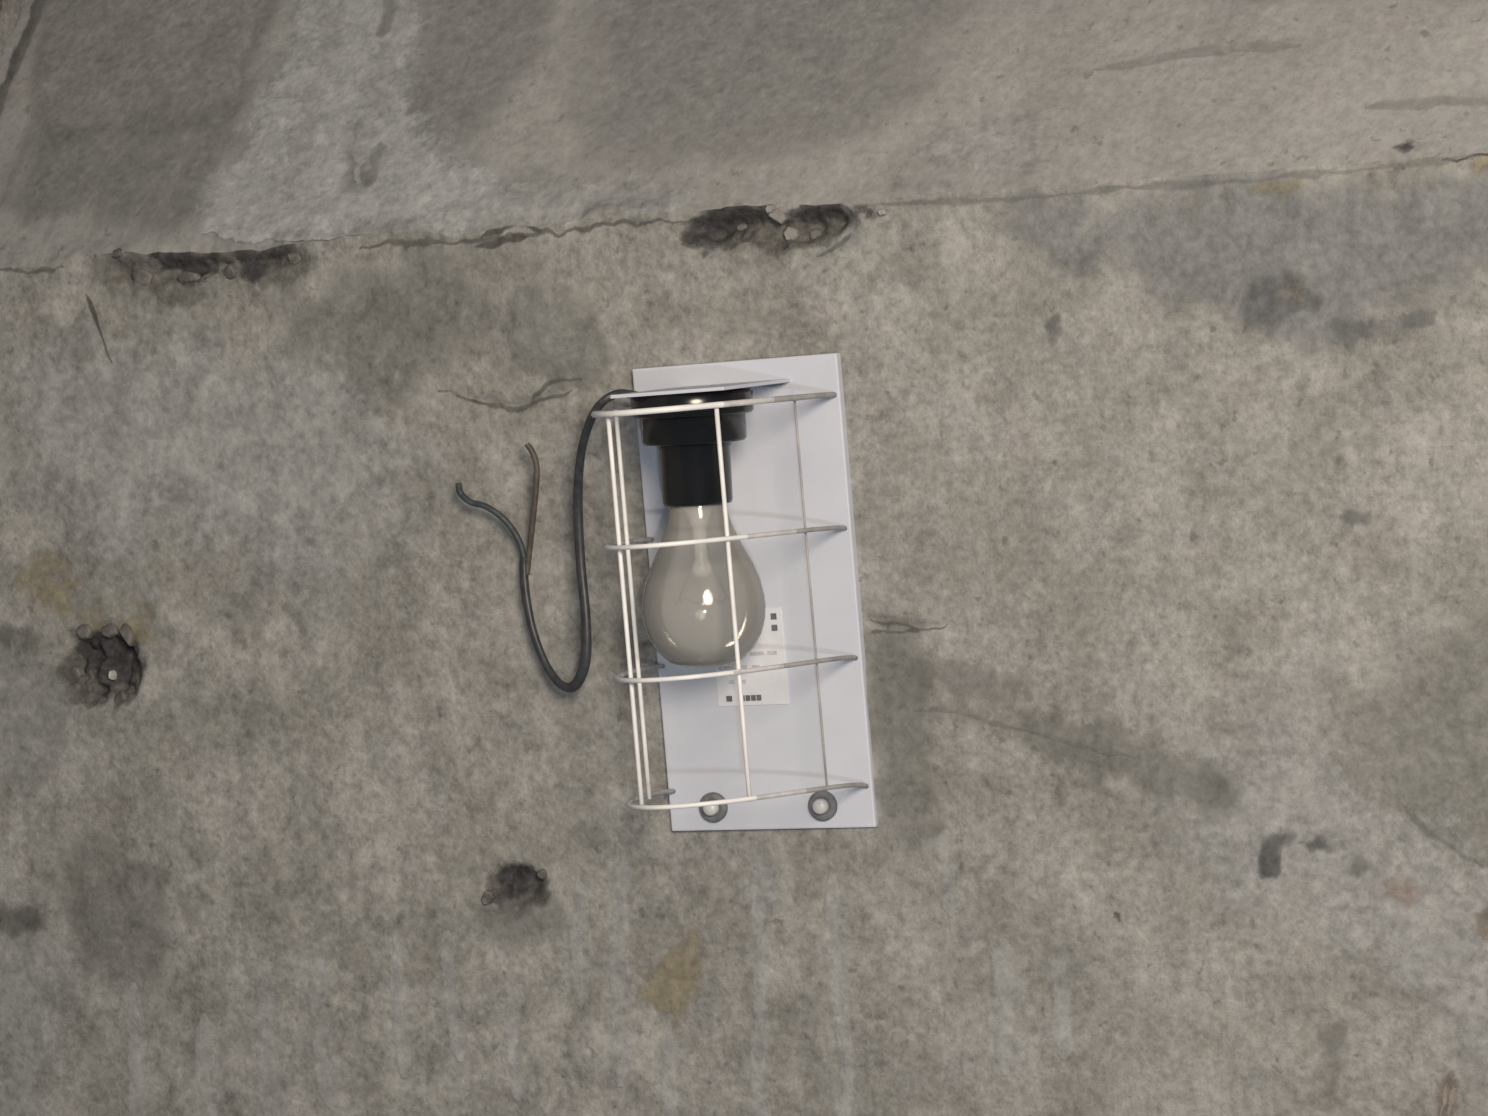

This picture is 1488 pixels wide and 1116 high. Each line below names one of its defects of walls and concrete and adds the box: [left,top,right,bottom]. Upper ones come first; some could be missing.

crack [0,0,45,111]
crack [1442,153,1488,162]
crack [359,218,688,249]
spalling [682,204,887,259]
spalling [95,243,308,306]
spalling [57,623,146,708]
spalling [481,865,551,919]